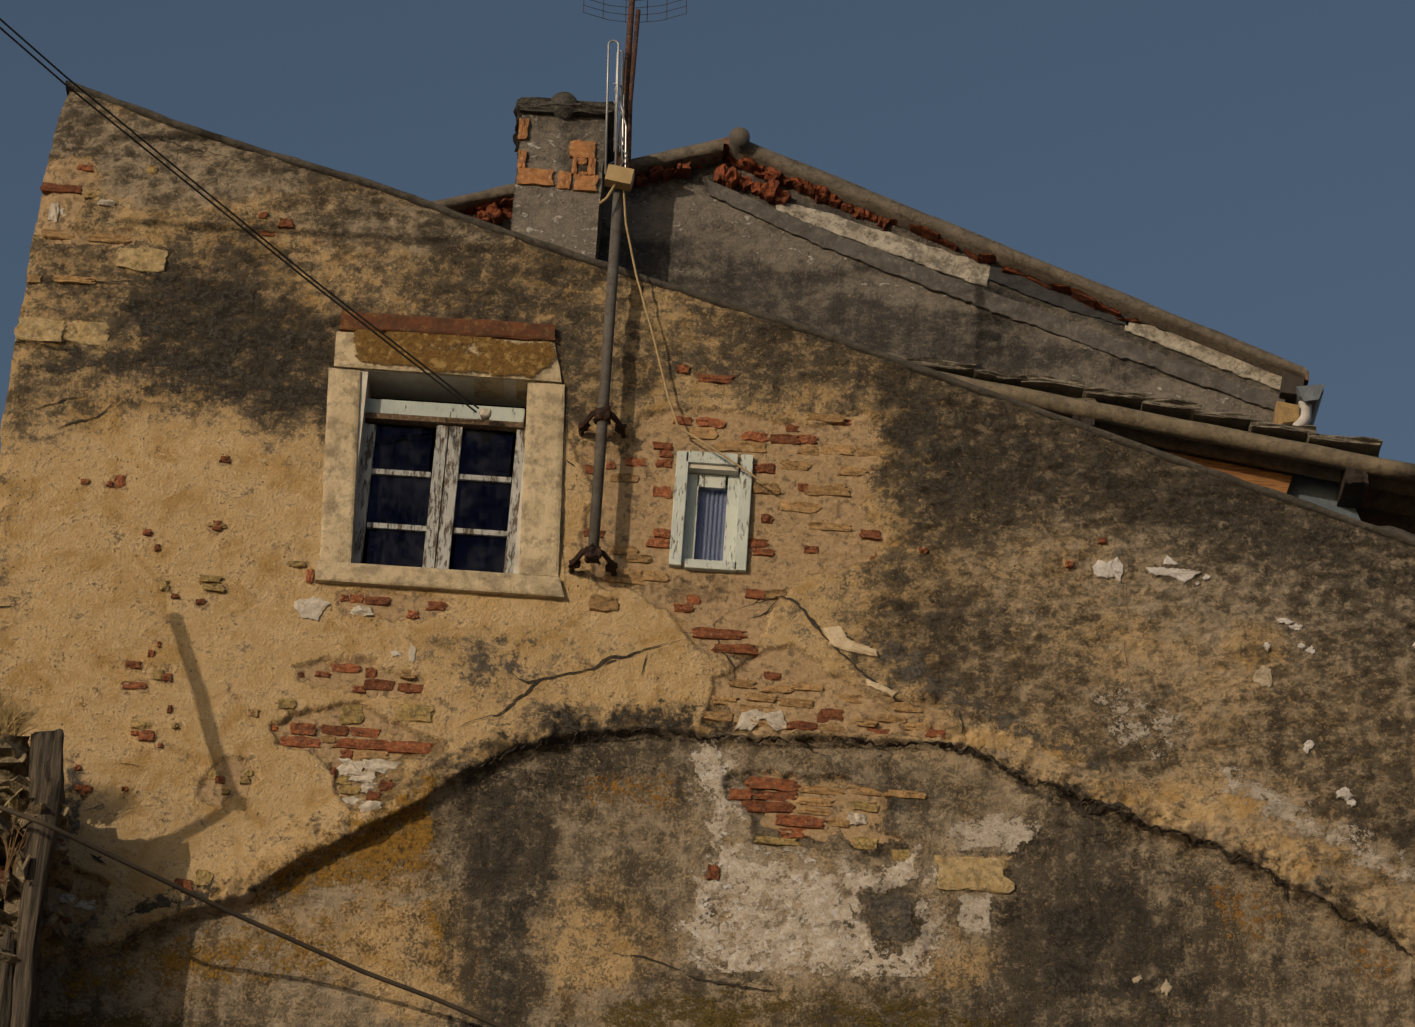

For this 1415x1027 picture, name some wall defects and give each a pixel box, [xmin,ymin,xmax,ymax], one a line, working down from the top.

water stain [19,261,334,426]
flaking render [676,364,735,384]
peeling [1062,537,1123,583]
peeling [1145,555,1211,586]
water stain [123,879,260,917]
flaking render [244,644,437,812]
water stain [448,760,563,1027]
flaking render [567,404,1043,980]
crack [449,588,1415,983]
water stain [1020,854,1214,1027]
water stain [1082,686,1197,761]
water stain [1208,752,1415,889]